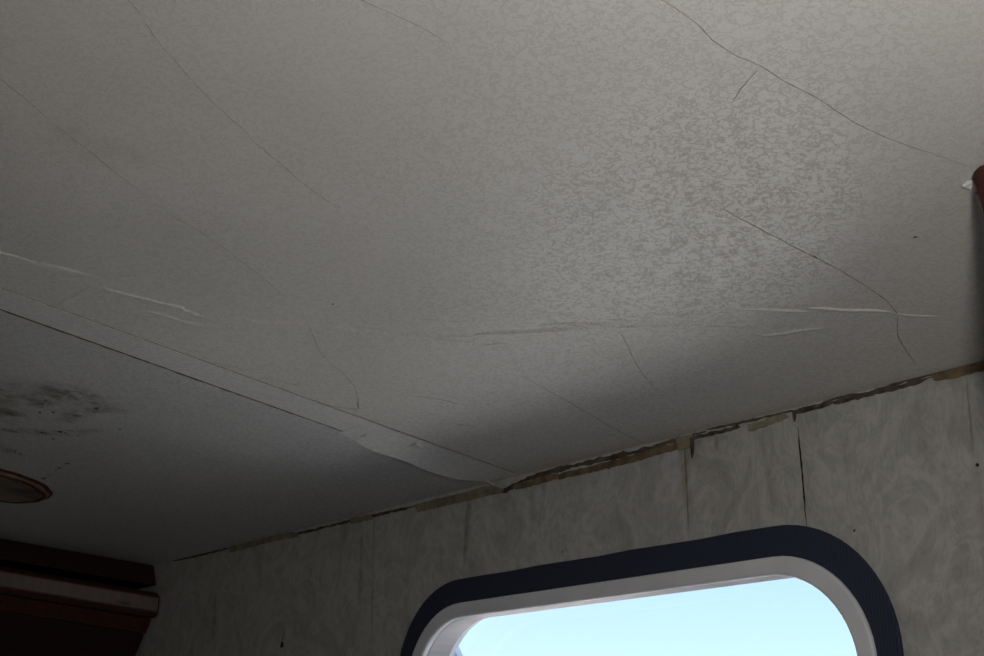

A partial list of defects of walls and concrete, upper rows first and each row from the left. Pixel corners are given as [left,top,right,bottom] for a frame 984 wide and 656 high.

crack [661,0,972,168]
crack [493,209,984,525]
peeling [338,421,513,485]
crack [290,506,415,534]
crack [173,548,228,561]